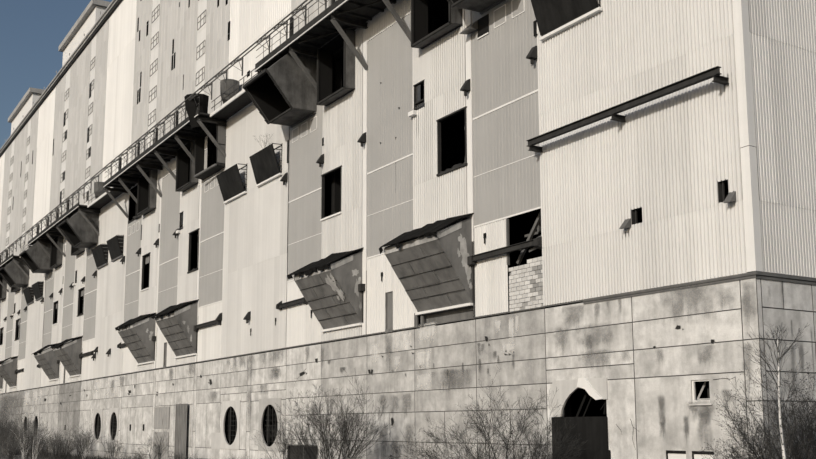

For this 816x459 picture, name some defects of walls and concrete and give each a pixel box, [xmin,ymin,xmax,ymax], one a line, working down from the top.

peeling [325,273,345,301]
peeling [457,234,472,289]